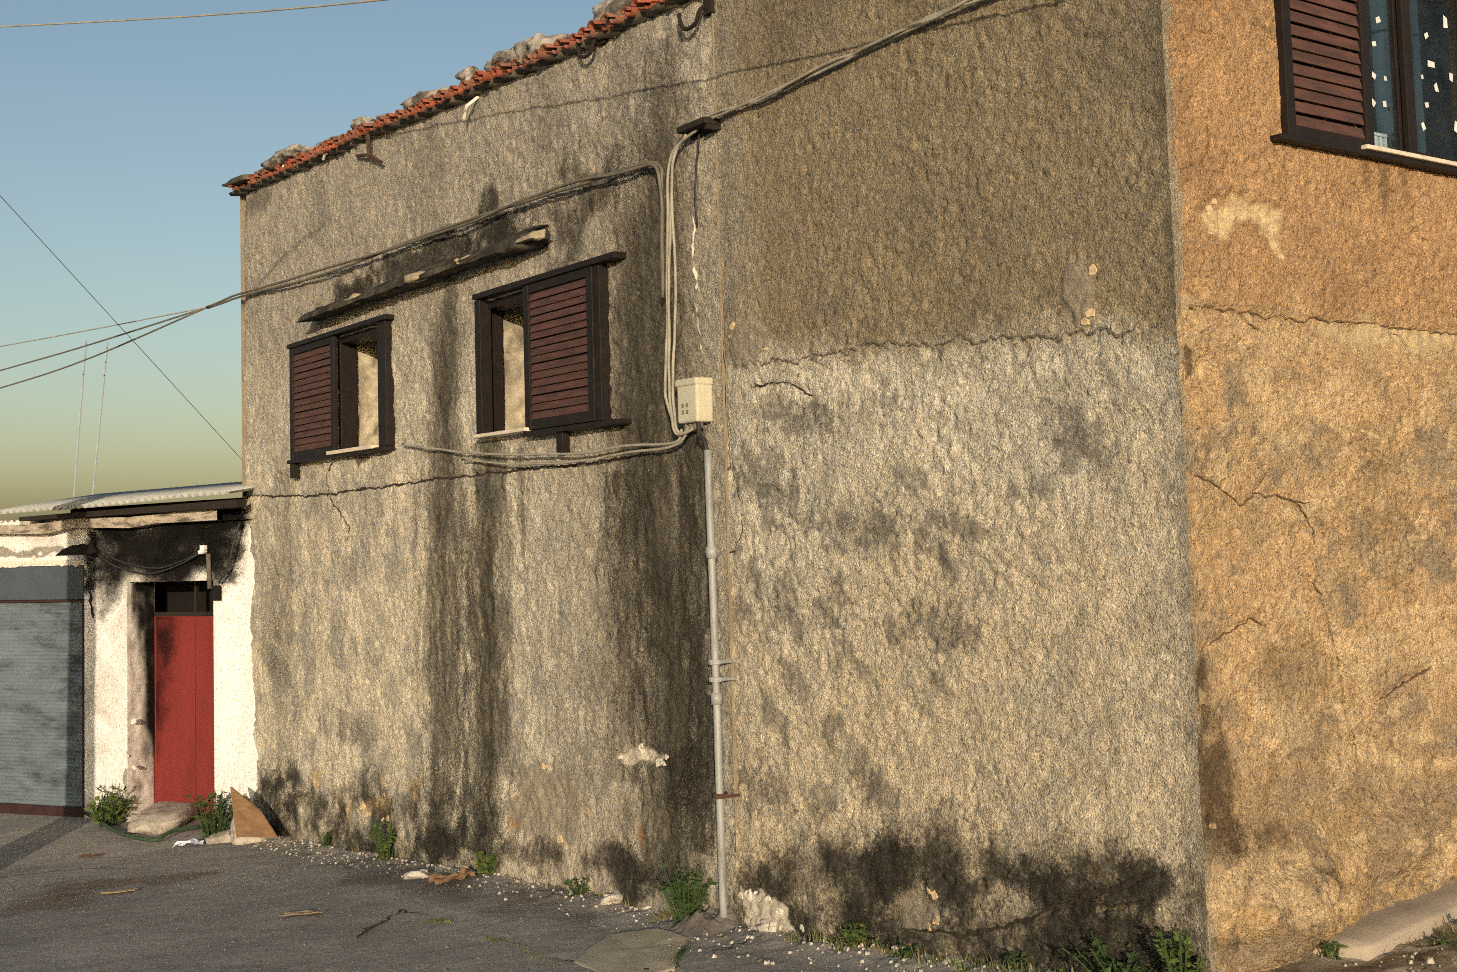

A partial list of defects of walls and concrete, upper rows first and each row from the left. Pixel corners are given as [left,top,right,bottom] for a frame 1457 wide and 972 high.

water stain [334,184,526,302]
water stain [547,146,620,265]
water stain [256,280,562,869]
water stain [584,90,715,907]
flaking render [617,743,669,767]
water stain [733,810,1206,972]